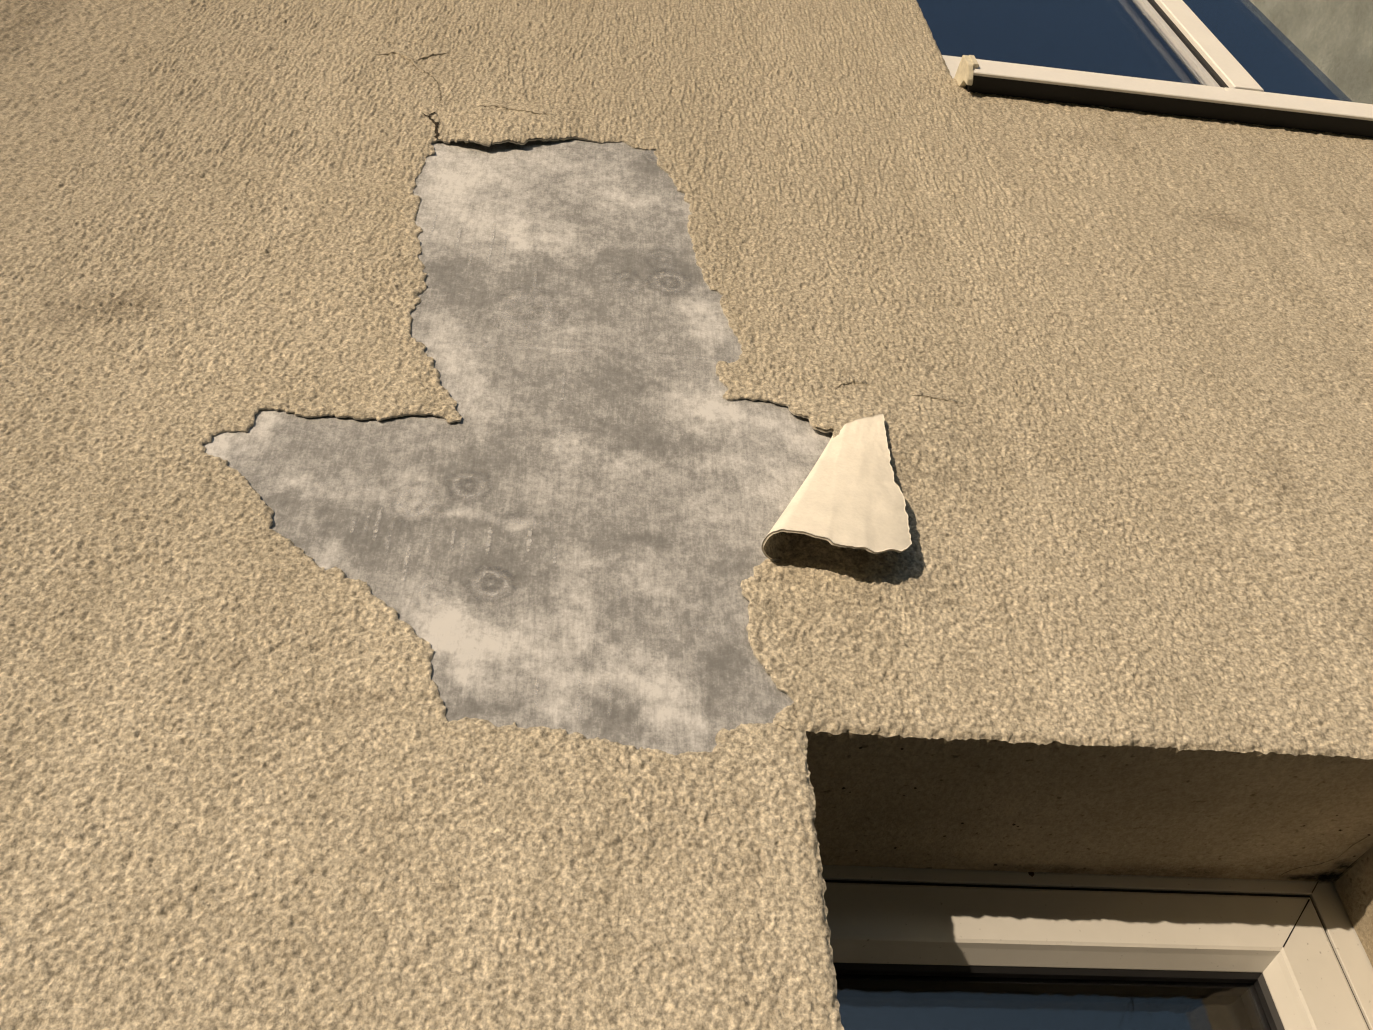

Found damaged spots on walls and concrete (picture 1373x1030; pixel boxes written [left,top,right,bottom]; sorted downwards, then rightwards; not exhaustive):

crack [374,46,562,138]
peeling [203,137,912,755]